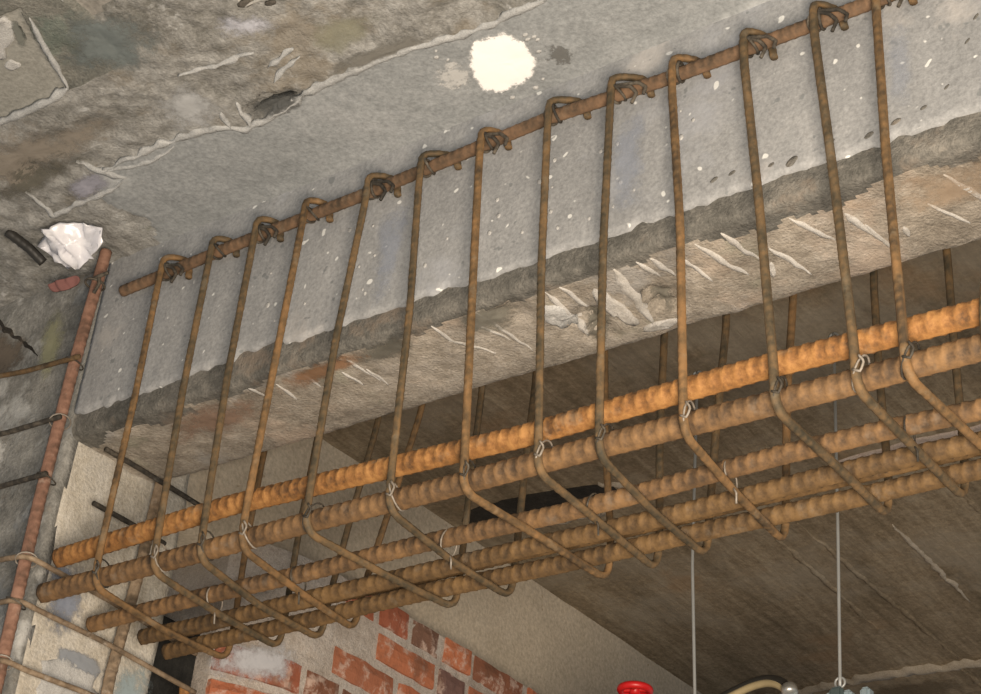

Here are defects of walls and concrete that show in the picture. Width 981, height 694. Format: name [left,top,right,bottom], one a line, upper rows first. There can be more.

crack [25,0,547,218]
spalling [545,286,677,339]
peeling [839,424,981,462]
spalling [0,248,200,694]
spalling [462,482,623,524]
crack [766,658,981,694]